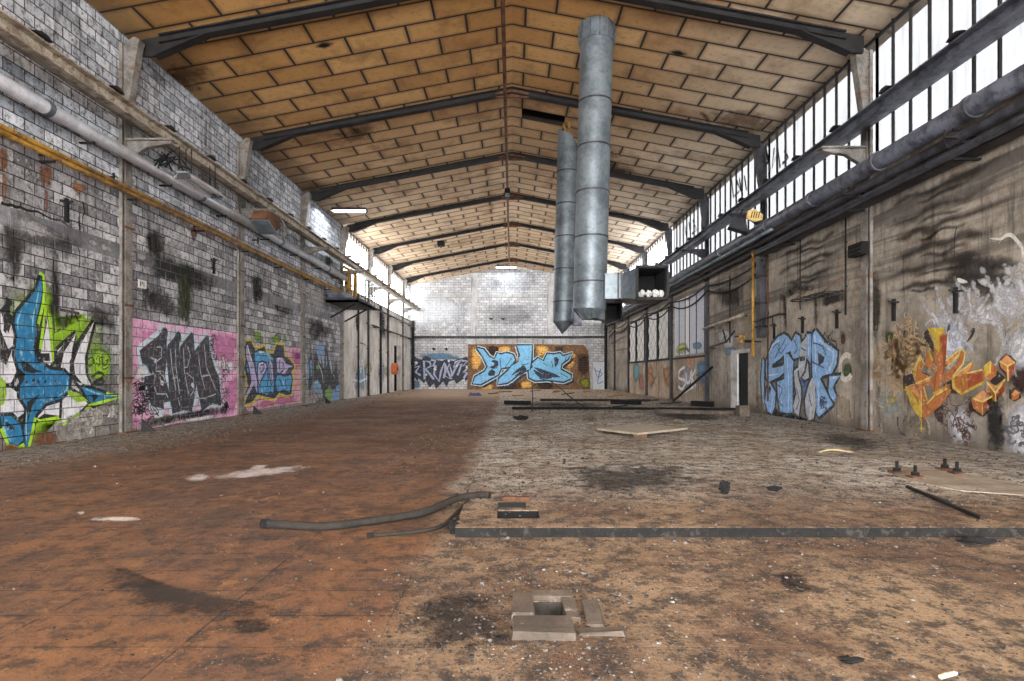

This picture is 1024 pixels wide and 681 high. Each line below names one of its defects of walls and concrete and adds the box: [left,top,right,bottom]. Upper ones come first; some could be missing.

rust [0,148,8,201]
rust [40,165,52,211]
damp [2,221,53,257]
damp [137,284,177,319]